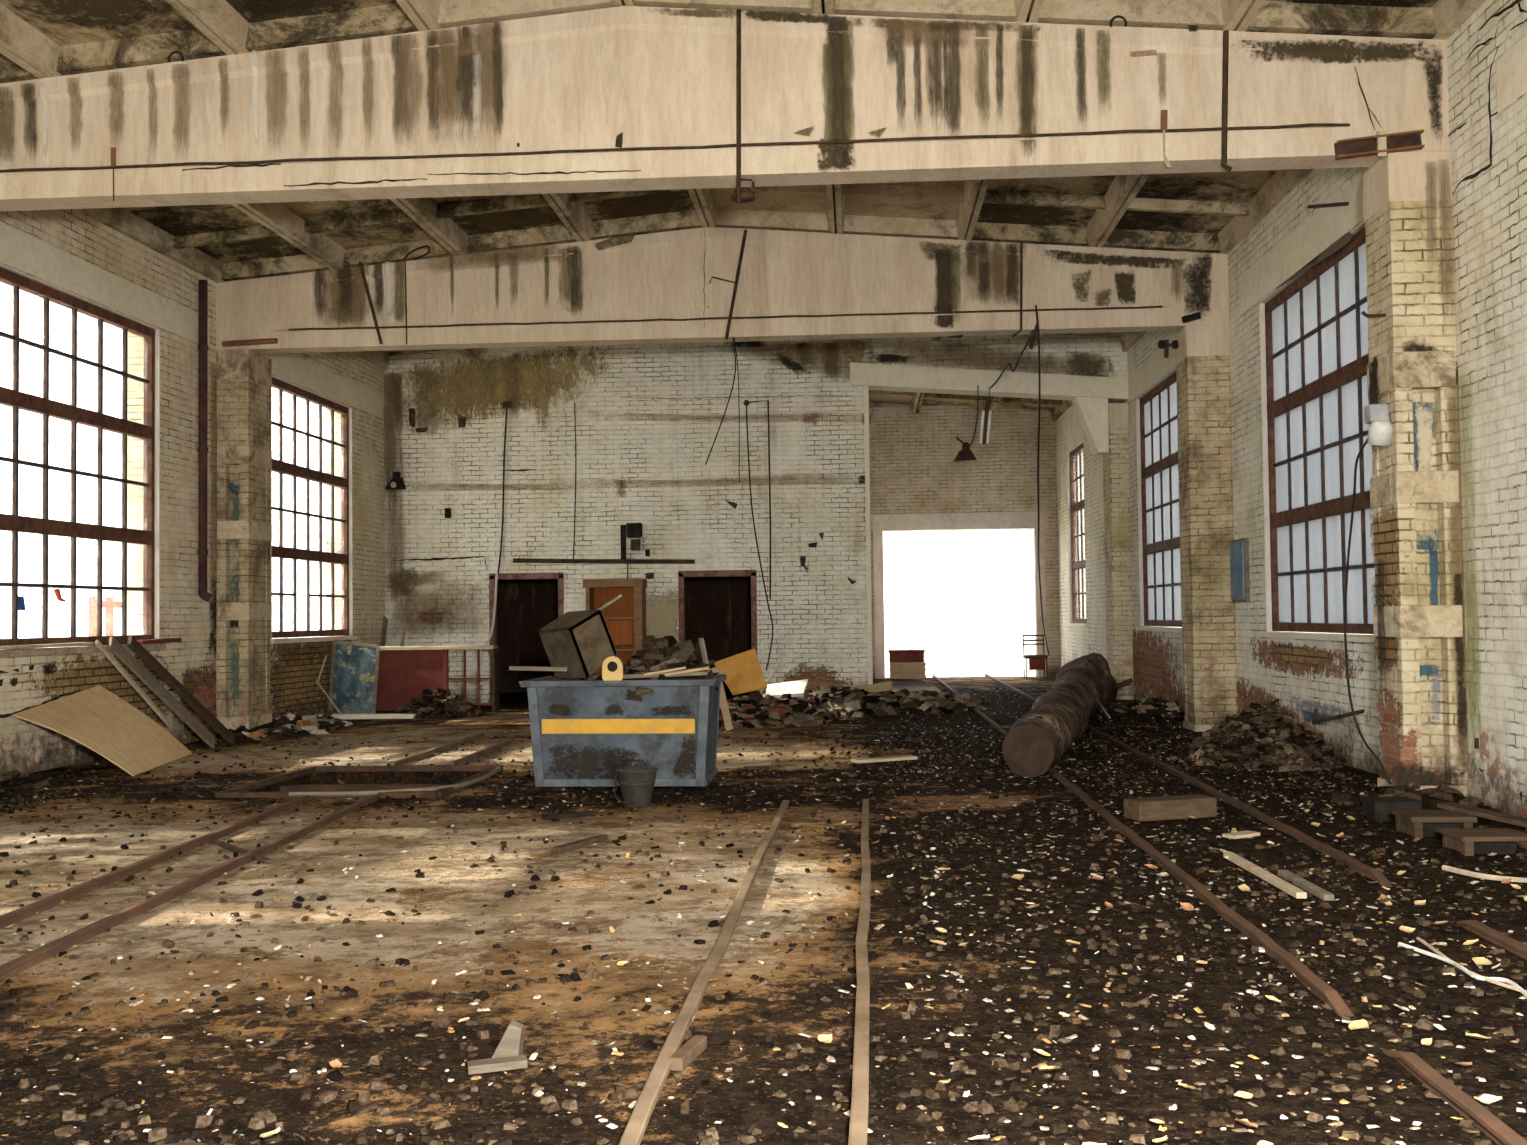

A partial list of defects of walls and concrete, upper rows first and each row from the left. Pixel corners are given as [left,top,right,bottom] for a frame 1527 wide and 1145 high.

leakage [392,22,503,131]
leakage [665,8,1040,171]
leakage [1076,28,1109,117]
leakage [1242,39,1442,131]
crack [1448,0,1527,194]
leakage [437,200,582,313]
leakage [922,242,1018,328]
leakage [1046,250,1212,315]
leakage [726,341,1112,377]
peeling [1236,506,1400,768]
peeling [1420,665,1441,719]
peeling [1377,689,1485,786]